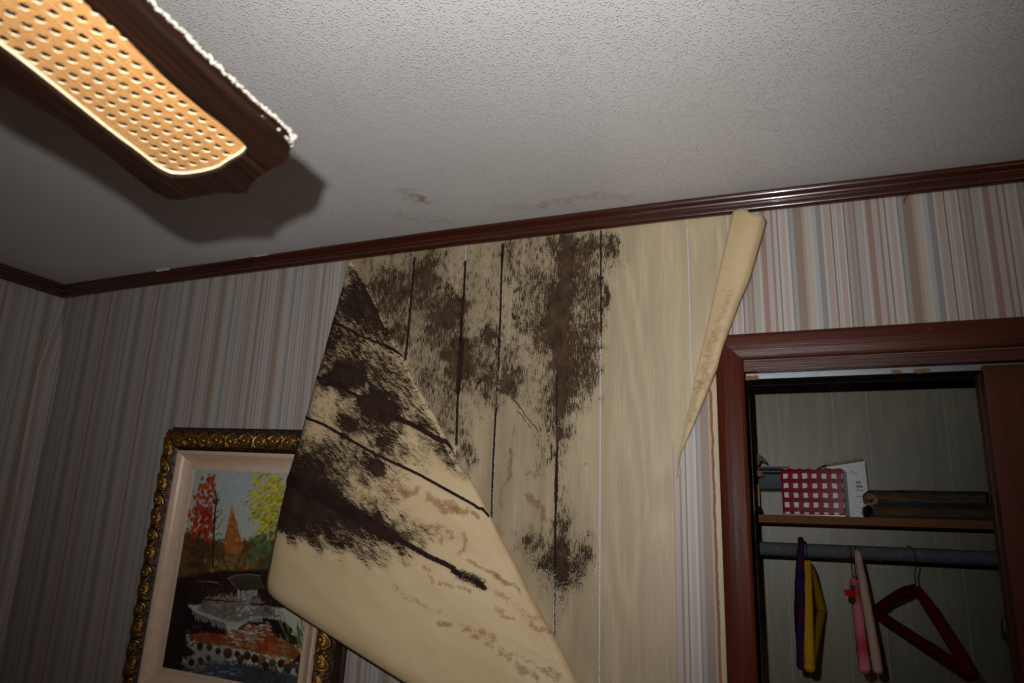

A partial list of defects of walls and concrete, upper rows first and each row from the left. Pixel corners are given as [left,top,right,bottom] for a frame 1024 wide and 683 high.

peeling [266,261,578,683]
leakage [276,230,630,636]